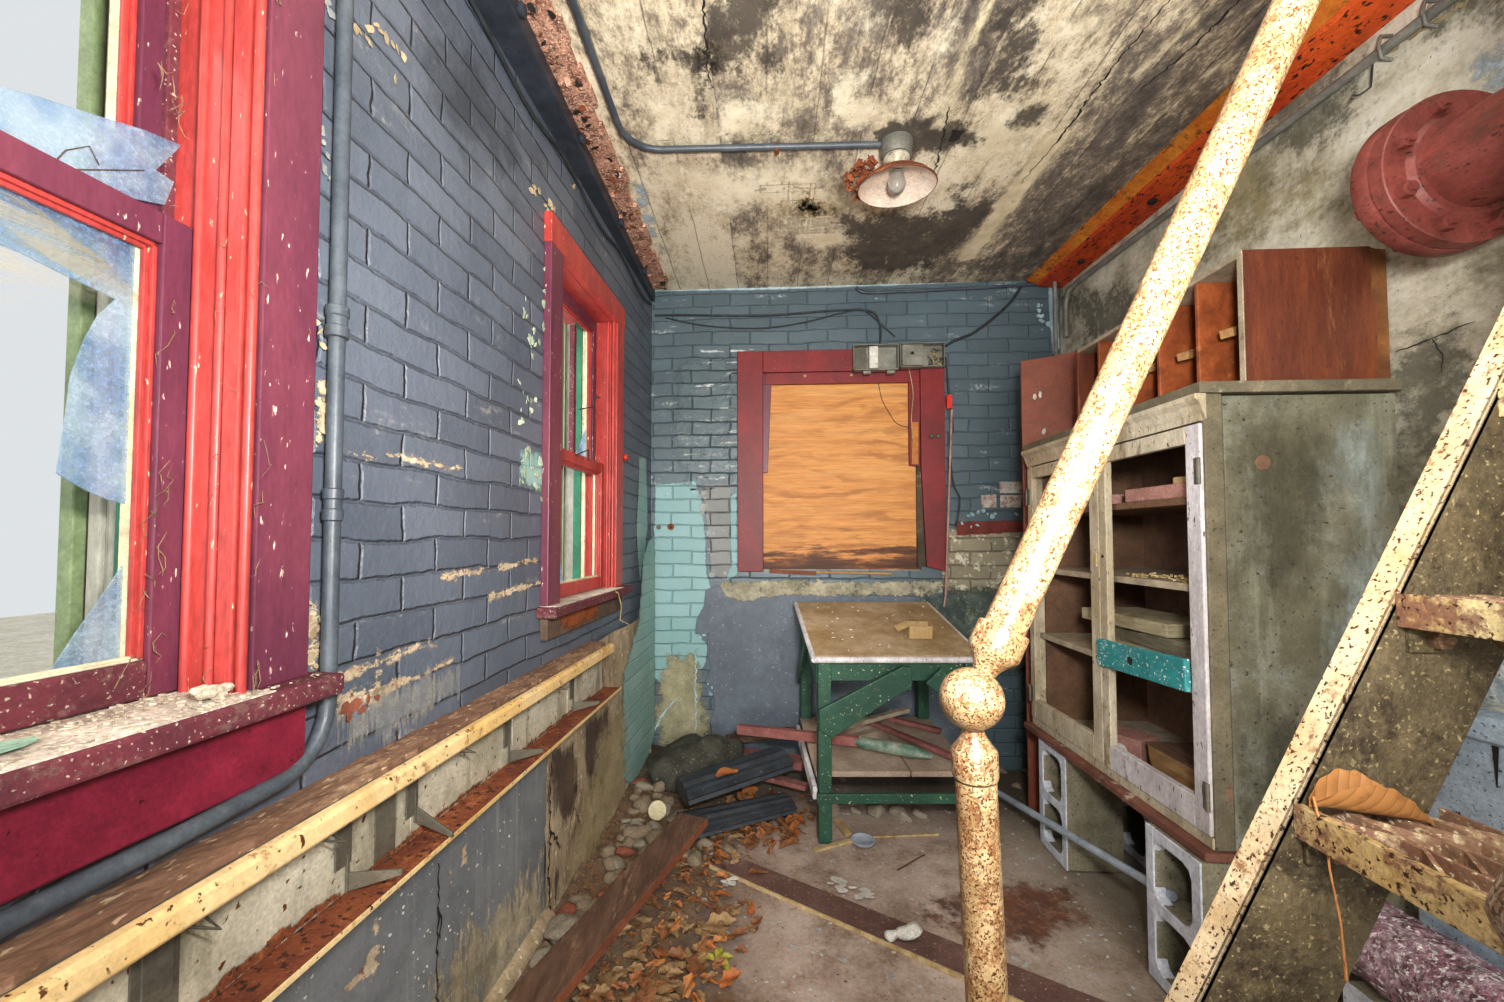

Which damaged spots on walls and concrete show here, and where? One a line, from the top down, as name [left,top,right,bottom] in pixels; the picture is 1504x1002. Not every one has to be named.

peeling [353,22,407,85]
water stain [1424,0,1504,37]
peeling [321,125,331,180]
water stain [640,0,1115,276]
water stain [1266,63,1357,158]
peeling [522,289,546,360]
peeling [517,379,537,425]
peeling [519,446,544,502]
peeling [439,558,541,603]
peeling [622,349,943,783]
peeling [335,638,453,723]
water stain [550,704,627,901]